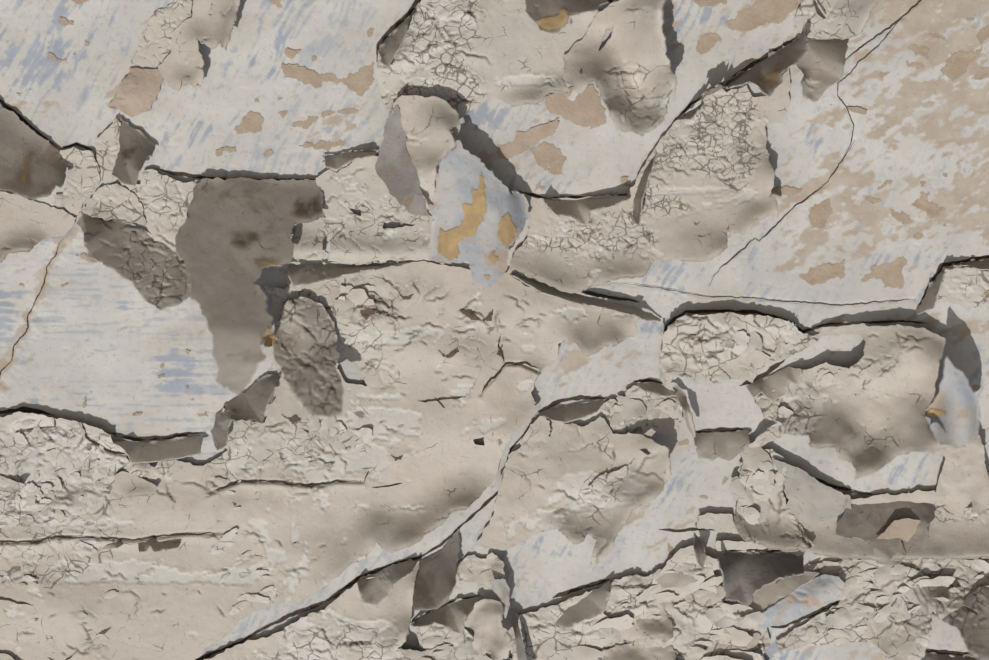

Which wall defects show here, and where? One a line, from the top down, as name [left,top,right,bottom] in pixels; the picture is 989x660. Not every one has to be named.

spalling [281,48,374,96]
peeling [495,0,677,175]
crack [582,0,989,349]
spalling [860,256,907,291]
peeling [937,264,989,308]
peeling [0,69,802,660]
crack [0,406,56,430]
crack [82,423,202,454]
crack [210,471,402,493]
crack [0,532,226,551]
crack [196,491,498,660]
peeling [503,513,989,660]